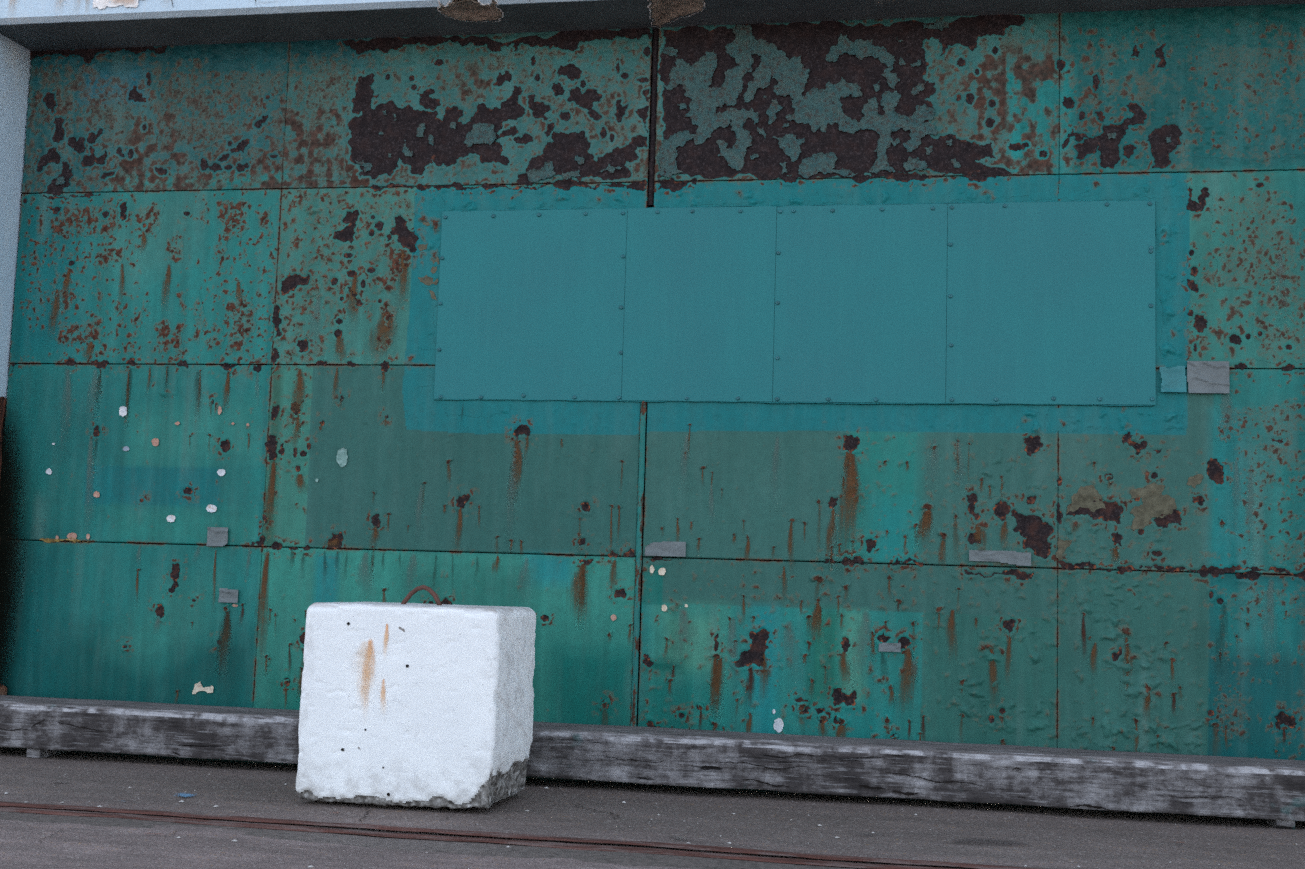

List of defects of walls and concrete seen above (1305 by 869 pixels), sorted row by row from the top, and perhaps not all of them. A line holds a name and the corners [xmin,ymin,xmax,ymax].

peeling [93,0,139,9]
corrosion [74,66,288,156]
peeling [343,0,1183,192]
corrosion [199,199,274,261]
corrosion [28,201,206,381]
corrosion [224,281,257,354]
corrosion [574,564,585,604]
corrosion [364,624,388,699]
corrosion [884,649,926,741]
corrosion [990,636,1011,683]
corrosion [1081,611,1096,665]
corrosion [1131,639,1182,744]